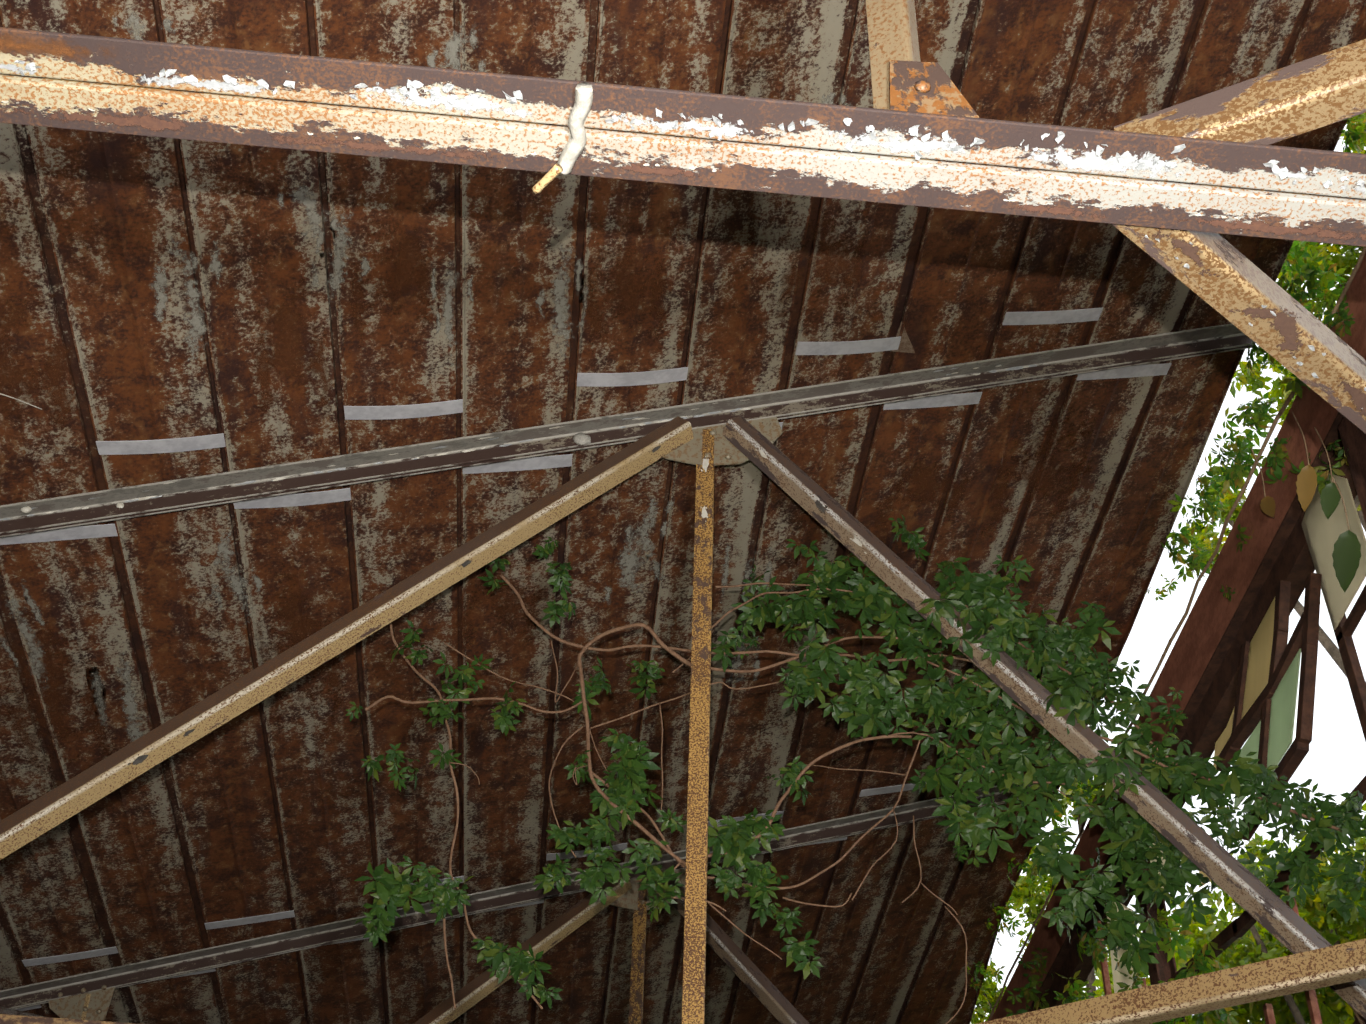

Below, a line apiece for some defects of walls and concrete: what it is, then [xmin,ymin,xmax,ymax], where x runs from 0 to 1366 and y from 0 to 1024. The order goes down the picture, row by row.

peeling [349,30,533,118]
corrosion [48,108,186,132]
corrosion [622,163,717,178]
peeling [605,93,985,160]
peeling [1020,132,1194,178]
peeling [1263,160,1366,194]
corrosion [1003,199,1106,219]
corrosion [1144,214,1366,277]
corrosion [1229,303,1326,378]
corrosion [1337,377,1366,416]
corrosion [481,565,547,642]
corrosion [5,614,112,773]